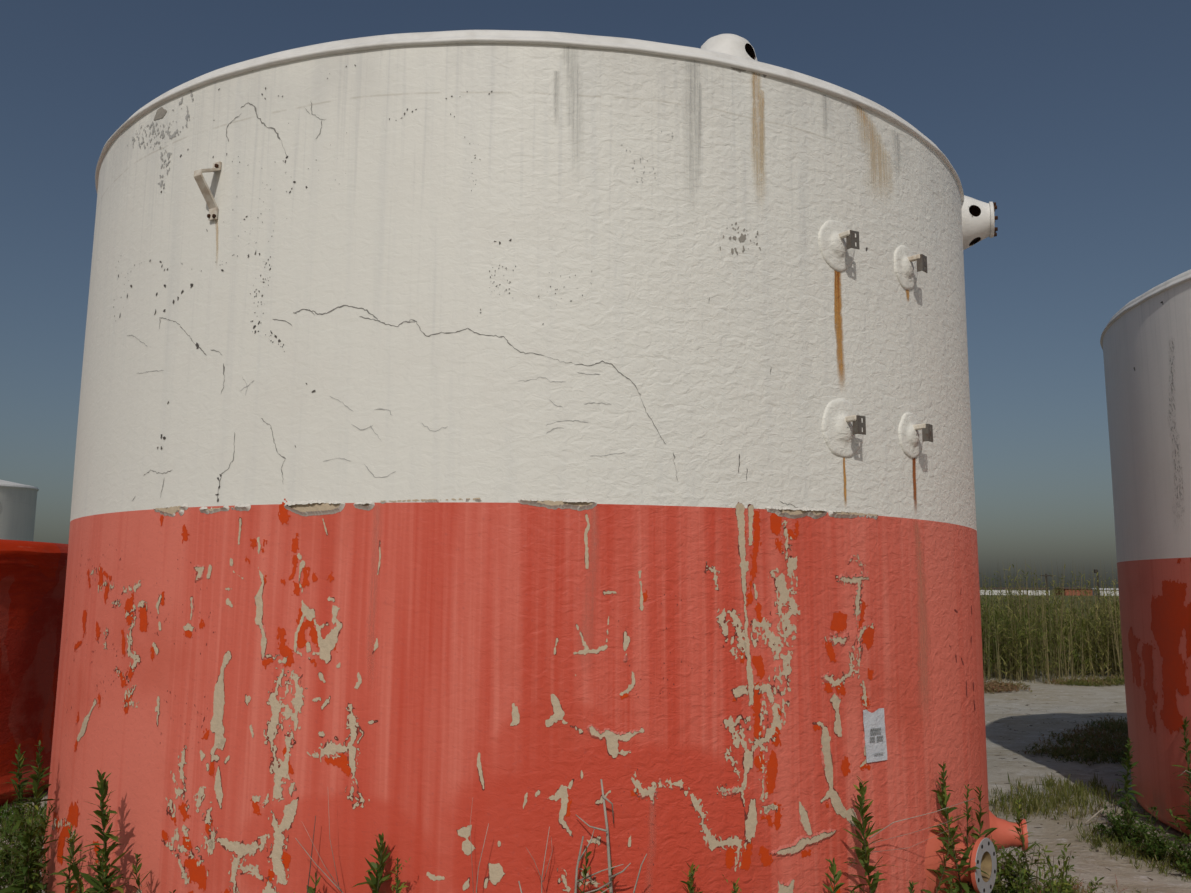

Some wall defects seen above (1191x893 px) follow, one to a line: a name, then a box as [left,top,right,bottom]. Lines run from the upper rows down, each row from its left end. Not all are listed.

crack [226,102,287,156]
corrosion [753,80,764,173]
corrosion [834,271,843,375]
crack [273,305,678,481]
peeling [66,559,214,752]
peeling [161,474,343,893]
peeling [307,703,378,809]
peeling [523,770,583,838]
peeling [545,694,644,759]
peeling [621,502,877,872]
peeling [1128,579,1191,734]
peeling [484,863,505,889]